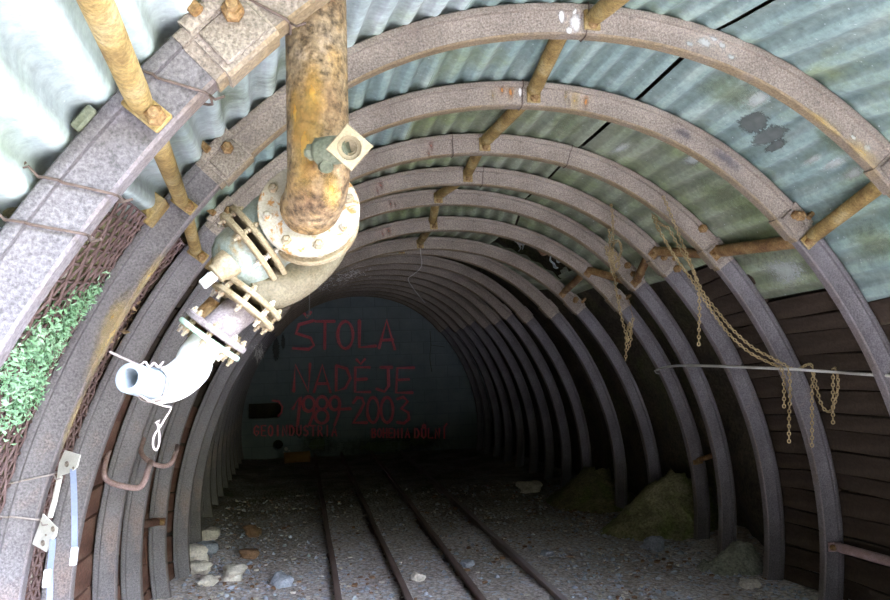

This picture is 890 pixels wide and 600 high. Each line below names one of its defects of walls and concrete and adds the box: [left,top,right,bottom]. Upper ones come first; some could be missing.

damp [738,92,788,152]